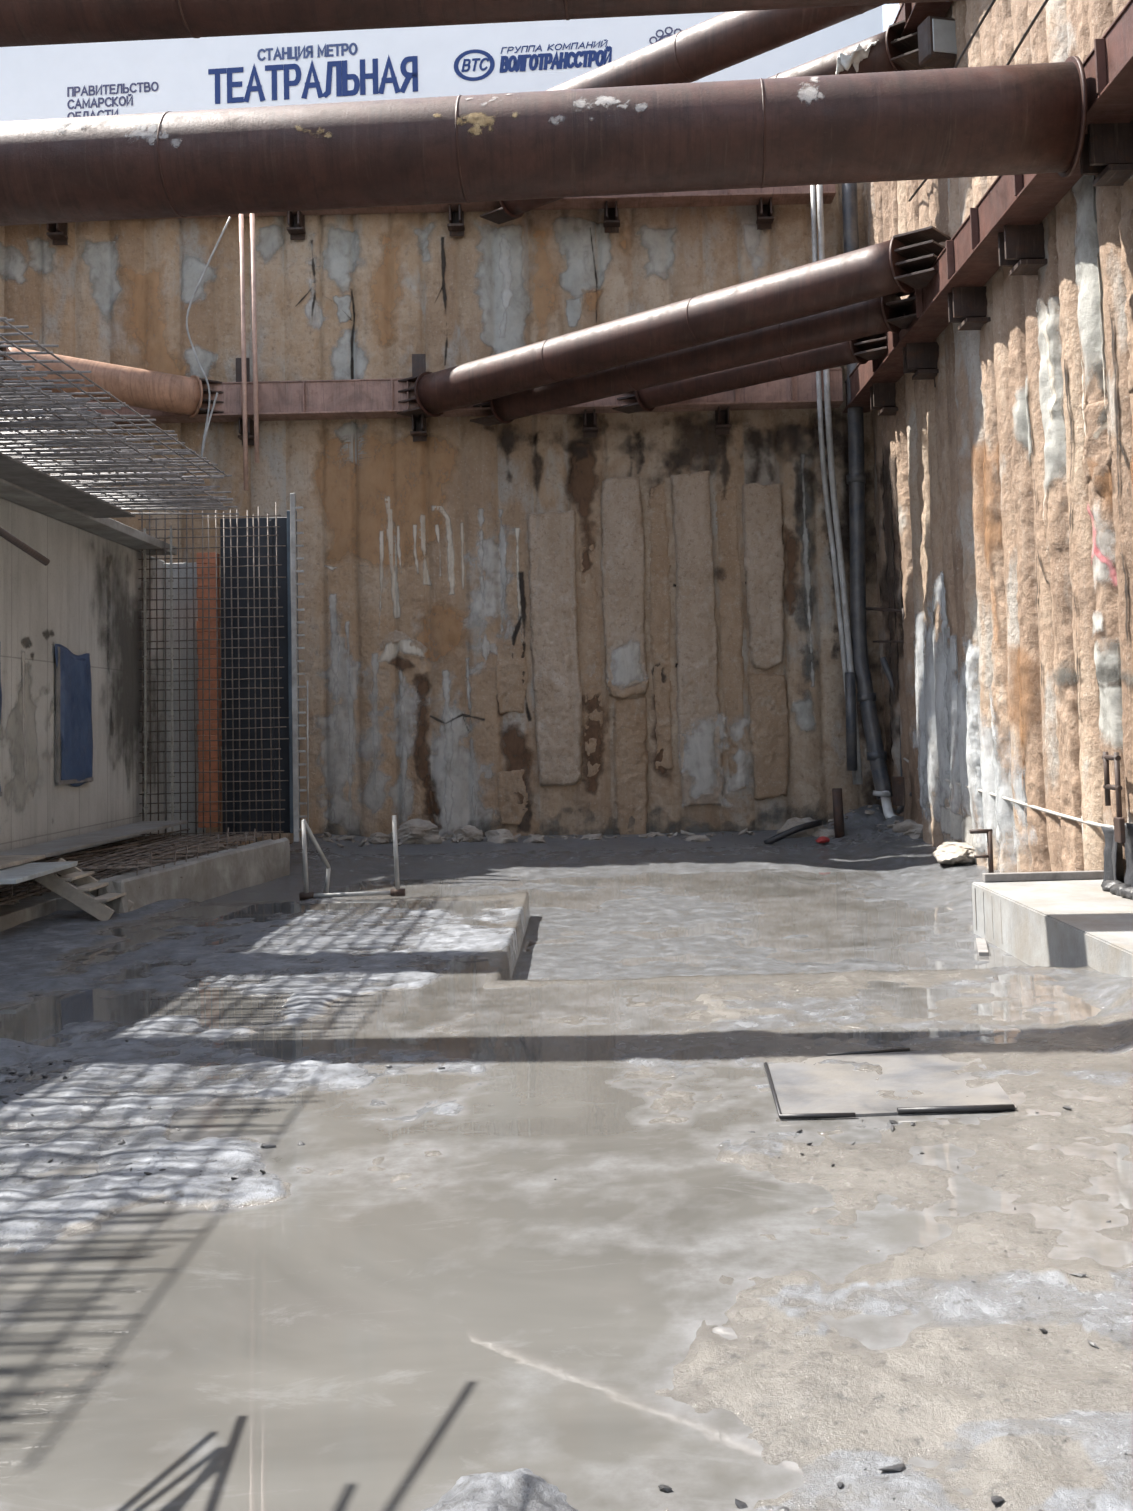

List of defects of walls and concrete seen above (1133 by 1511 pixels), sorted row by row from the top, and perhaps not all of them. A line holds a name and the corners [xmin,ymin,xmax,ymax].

peeling [798,77,823,103]
peeling [433,94,509,135]